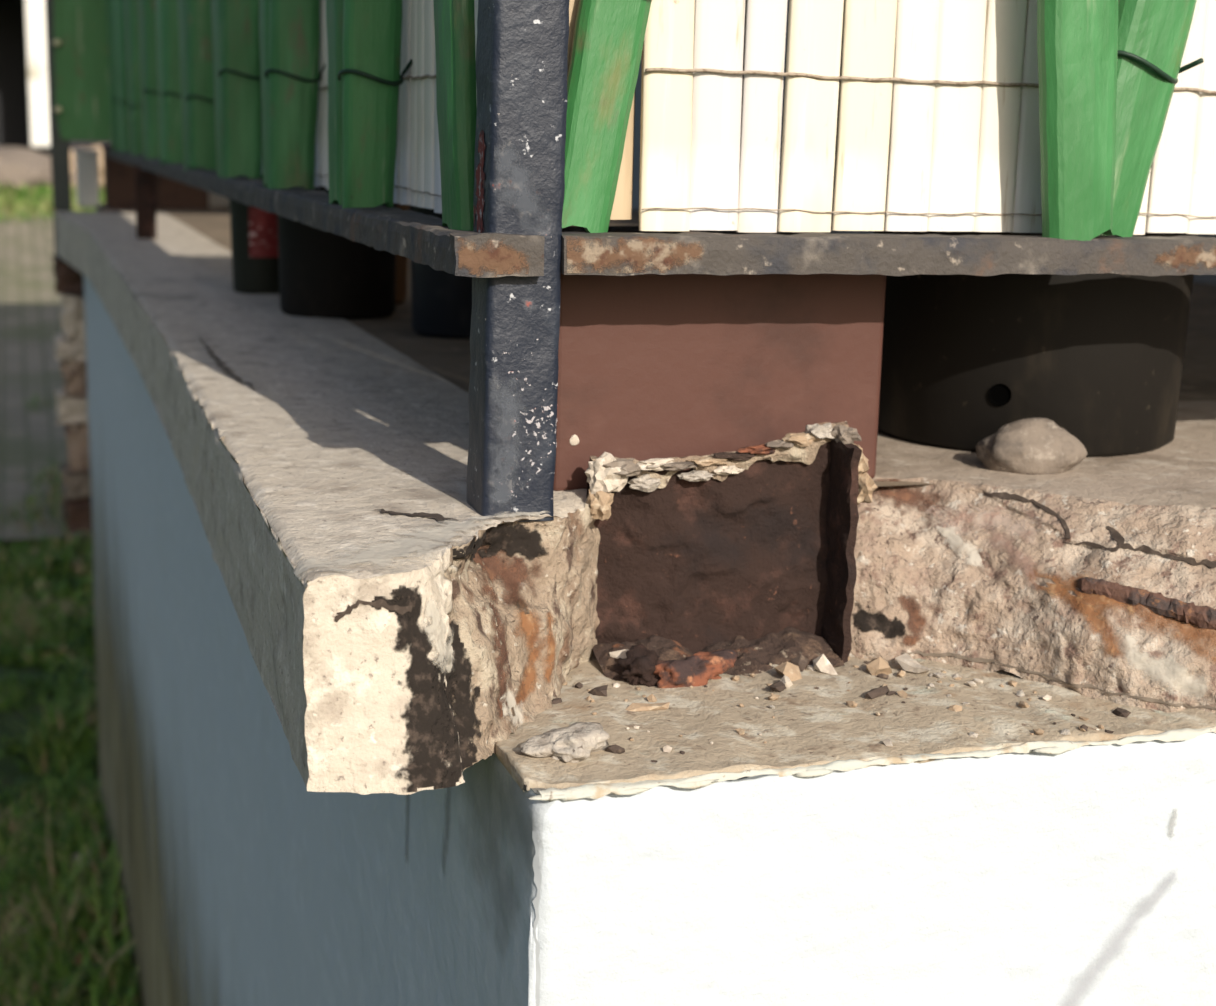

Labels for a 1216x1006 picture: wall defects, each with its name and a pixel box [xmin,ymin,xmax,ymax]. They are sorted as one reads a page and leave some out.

corrosion [567,236,703,273]
peeling [585,423,878,521]
crack [982,491,1216,568]
damp [372,585,481,792]
damp [450,536,539,724]
corrosion [515,599,555,706]
corrosion [1032,571,1216,660]